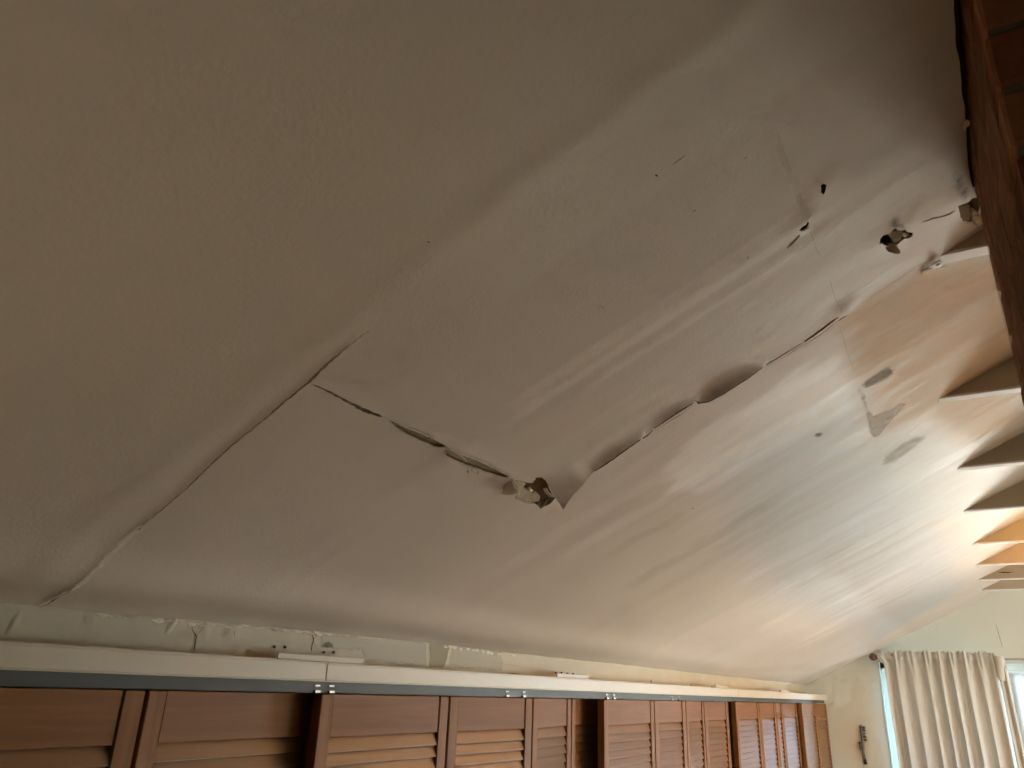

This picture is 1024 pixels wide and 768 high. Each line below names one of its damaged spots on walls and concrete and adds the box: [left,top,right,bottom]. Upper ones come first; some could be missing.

spalling [924,188,983,226]
leakage [865,369,892,387]
crack [139,331,369,530]